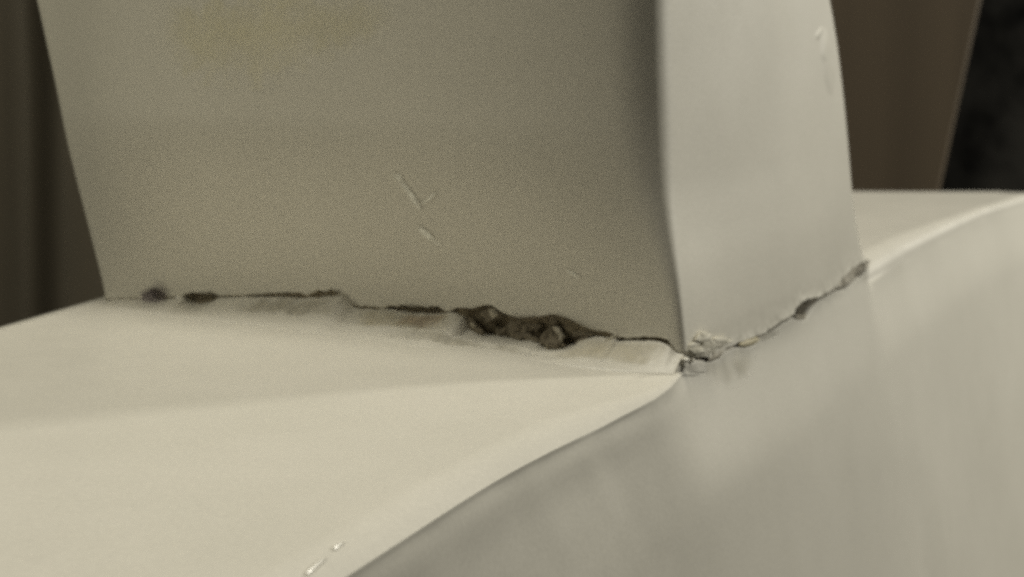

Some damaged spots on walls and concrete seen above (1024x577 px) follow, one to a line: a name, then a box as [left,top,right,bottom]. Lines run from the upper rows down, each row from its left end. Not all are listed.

crack [225,289,459,313]
spalling [458,305,619,350]
crack [620,317,790,361]